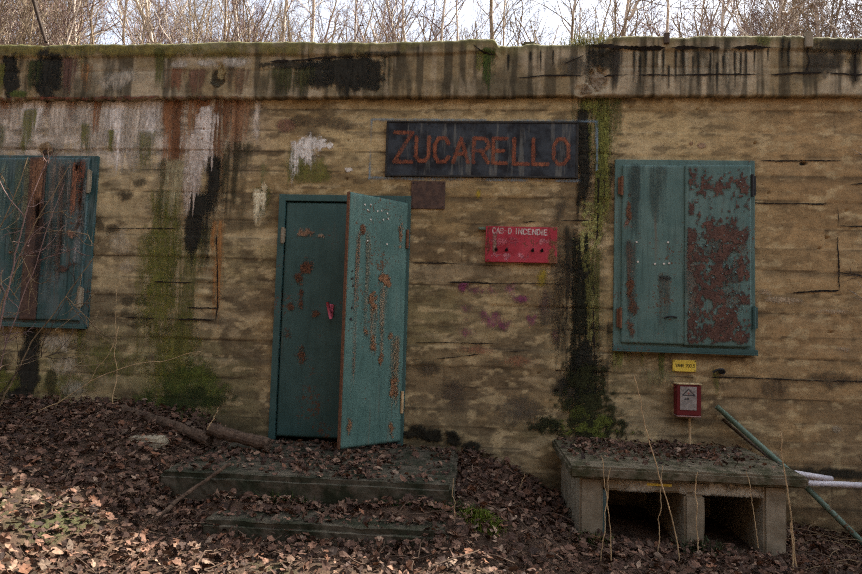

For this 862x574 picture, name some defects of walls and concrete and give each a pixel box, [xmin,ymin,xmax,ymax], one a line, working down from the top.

leakage [0,57,169,167]
rust [1,58,253,170]
leakage [155,48,187,83]
leakage [198,58,246,66]
leakage [588,42,756,86]
rust [30,158,86,294]
leakage [138,101,260,357]
rust [355,224,399,400]